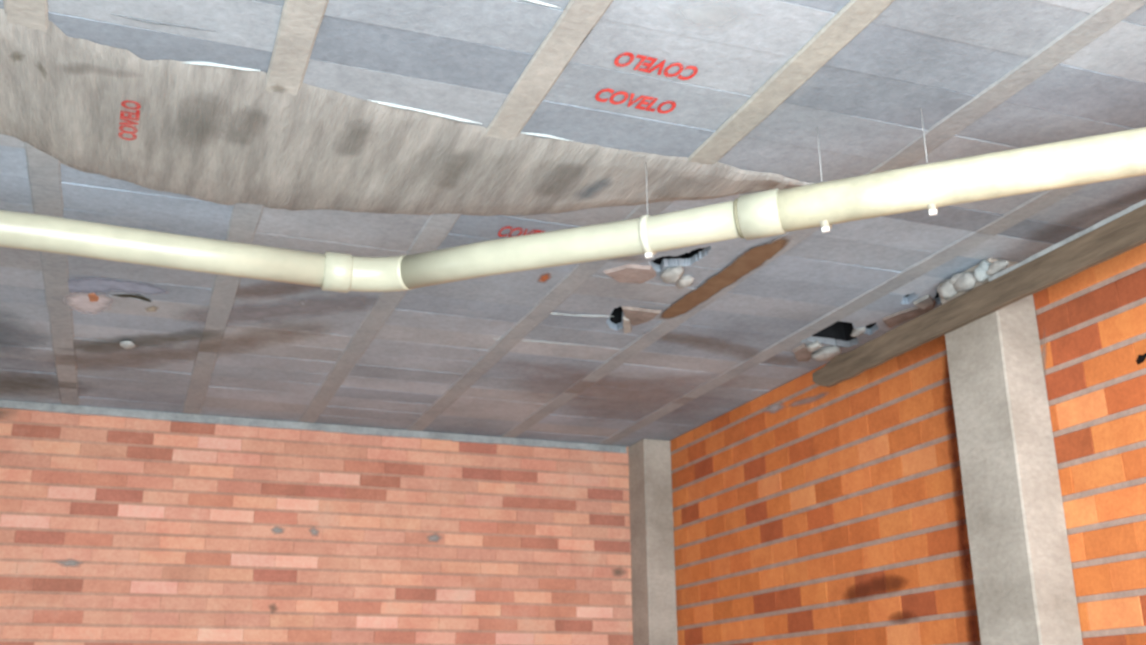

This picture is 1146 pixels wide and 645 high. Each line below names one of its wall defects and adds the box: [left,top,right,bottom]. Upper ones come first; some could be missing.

spalling [603,247,706,289]
flaking render [66,278,165,313]
leakage [228,298,367,321]
spalling [610,306,662,334]
spalling [793,292,939,362]
leakage [84,341,136,349]